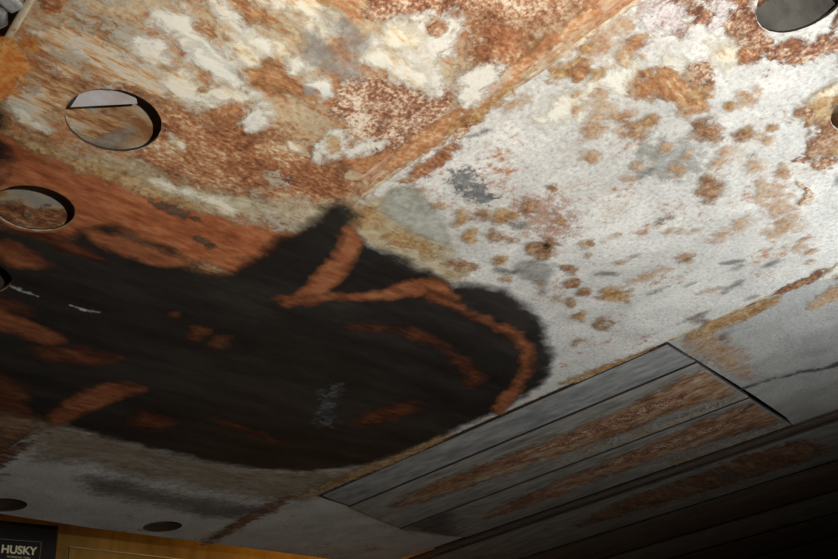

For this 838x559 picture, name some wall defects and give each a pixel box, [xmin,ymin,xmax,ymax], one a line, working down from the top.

water stain [0,298,116,364]
water stain [84,229,187,267]
corrosion [0,0,372,274]
water stain [23,383,370,518]
water stain [64,131,340,235]
water stain [277,187,535,415]
corrosion [192,0,661,184]
corrosion [454,185,581,262]
corrosion [629,60,779,205]
corrosion [664,0,838,77]
crack [728,362,838,421]
corrosion [747,83,838,240]